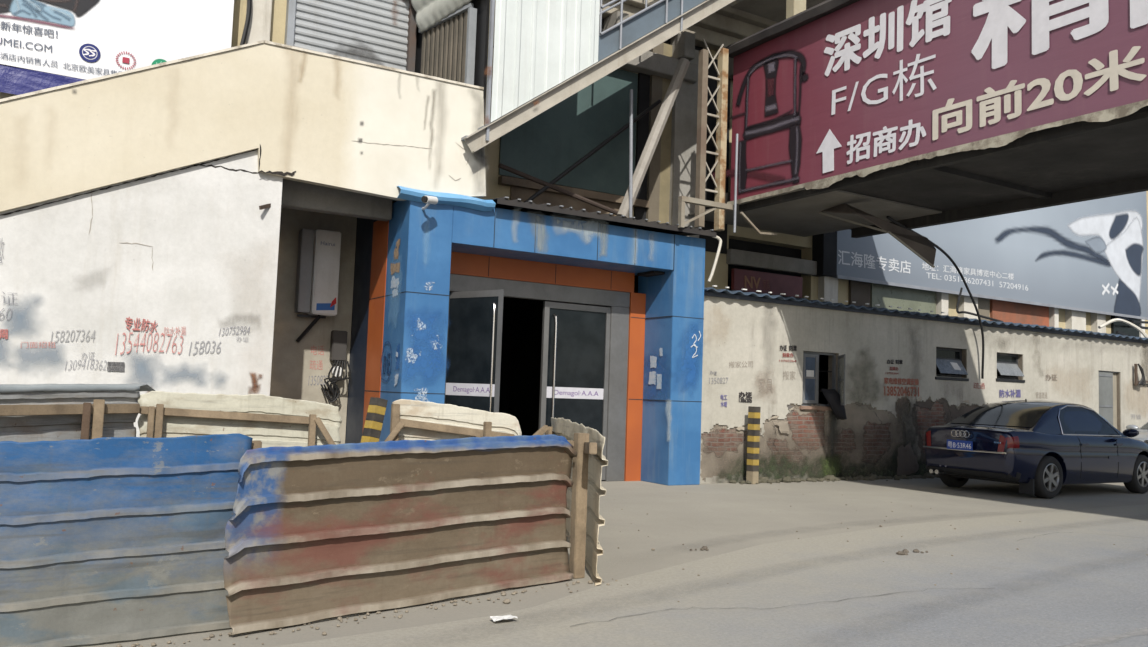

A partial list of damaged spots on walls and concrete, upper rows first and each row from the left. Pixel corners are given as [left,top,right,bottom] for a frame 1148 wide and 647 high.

crack [1,145,296,233]
spalling [700,397,979,480]